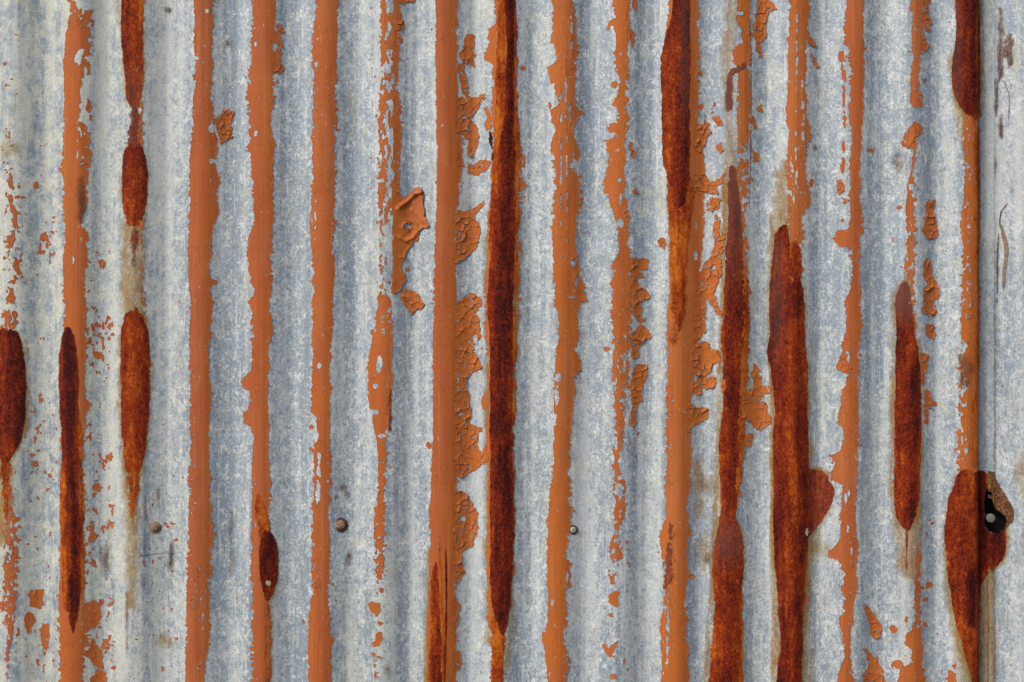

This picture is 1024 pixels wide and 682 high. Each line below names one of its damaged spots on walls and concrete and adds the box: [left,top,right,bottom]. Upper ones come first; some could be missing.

peeling [58,0,105,555]
rust [118,0,150,608]
peeling [184,0,285,682]
peeling [366,0,525,682]
rust [484,0,522,682]
peeling [602,0,651,617]
rust [660,0,695,346]
rust [705,165,750,682]
peeling [655,0,819,682]
rust [767,162,835,682]
peeling [826,0,933,682]
rust [944,0,1008,682]